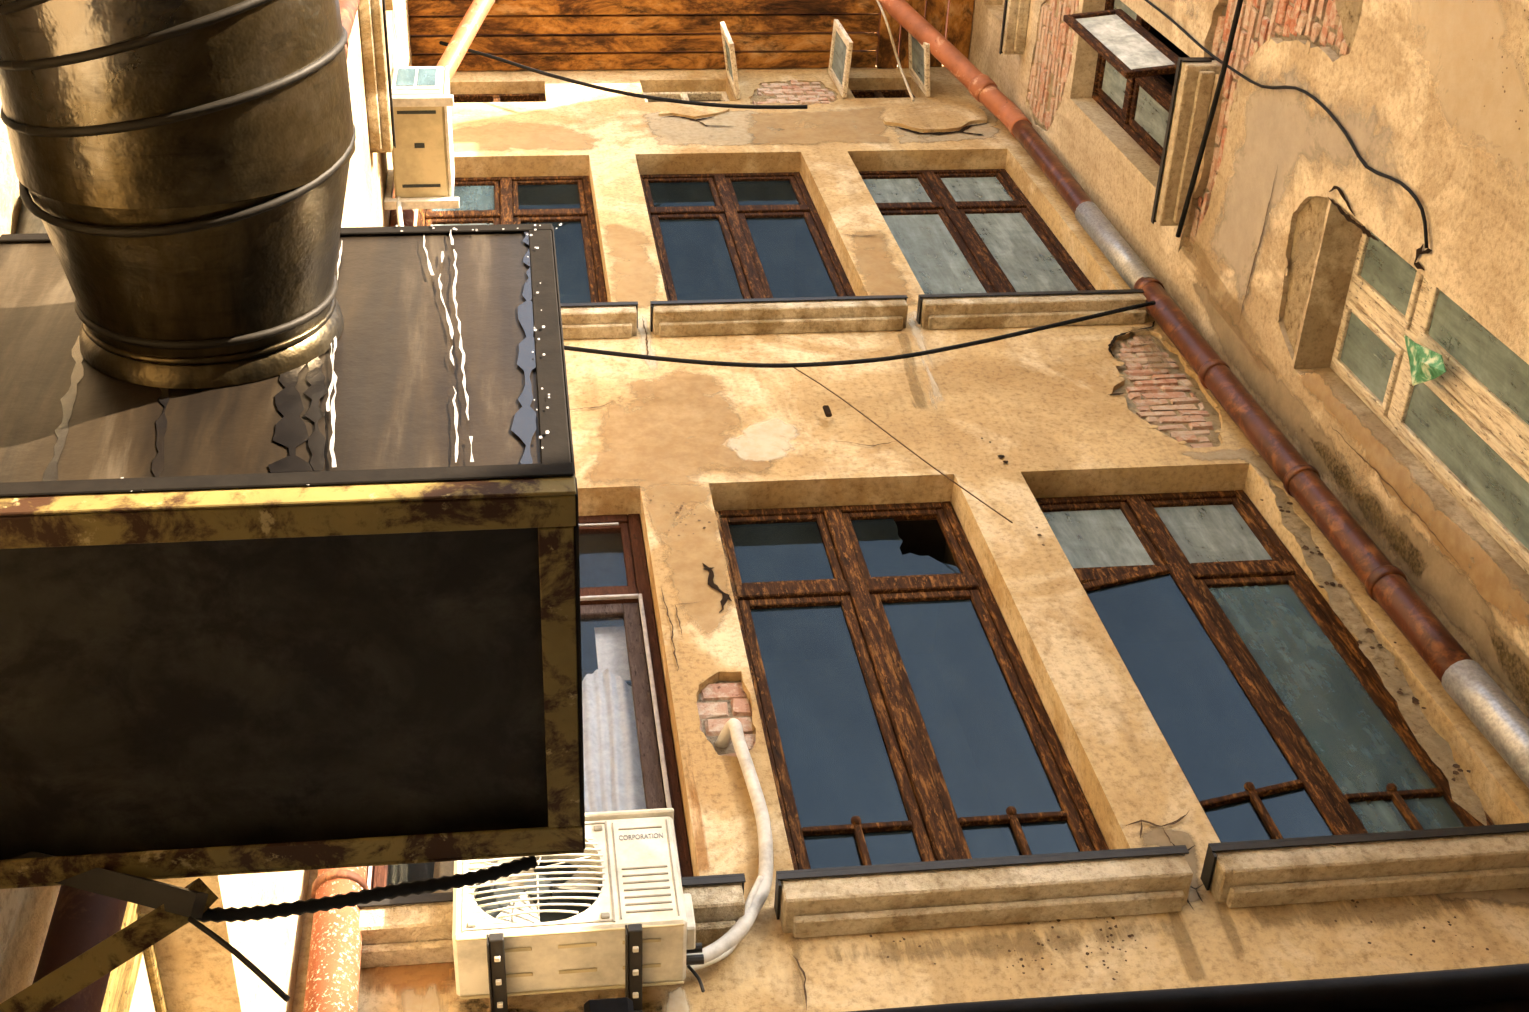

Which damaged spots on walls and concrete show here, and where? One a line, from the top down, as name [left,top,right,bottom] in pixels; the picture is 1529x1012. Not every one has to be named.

flaking render [1027,0,1079,131]
flaking render [1188,0,1363,247]
water stain [589,224,797,634]
crack [661,563,732,671]
spalling [697,680,756,757]
flaking render [1111,328,1487,826]